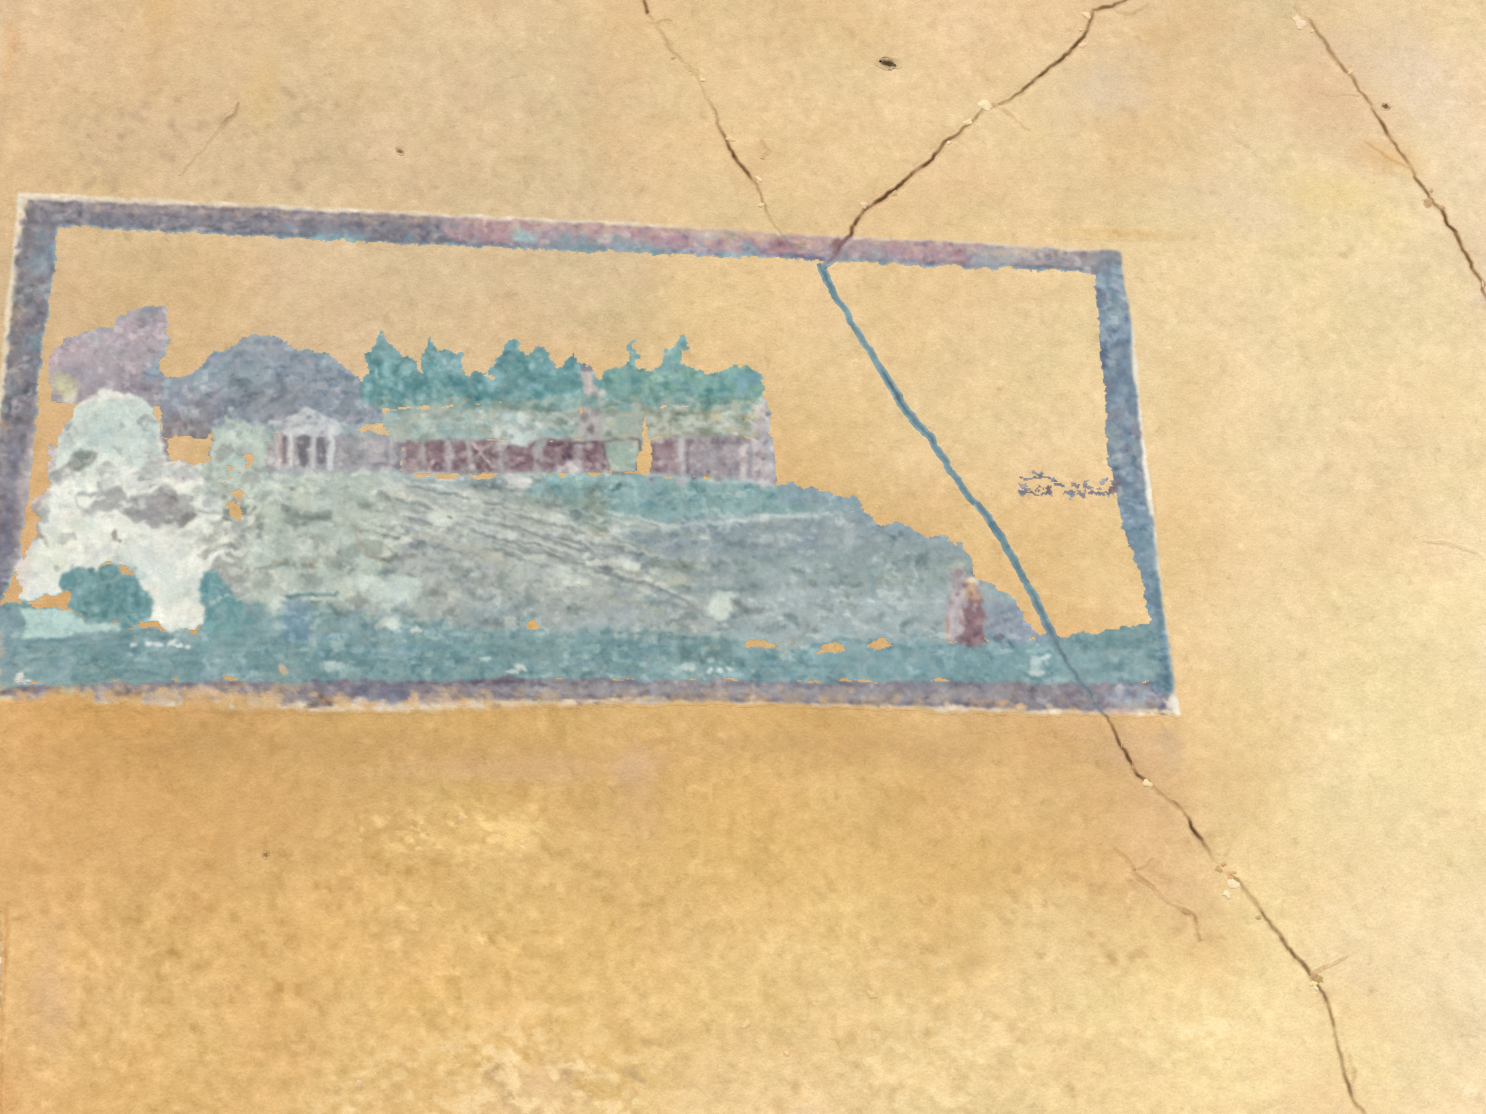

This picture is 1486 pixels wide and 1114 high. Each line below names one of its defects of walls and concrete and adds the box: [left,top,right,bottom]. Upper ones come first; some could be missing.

crack [1291,6,1486,301]
crack [640,0,1369,1114]
crack [1423,538,1485,561]
crack [0,901,12,1114]